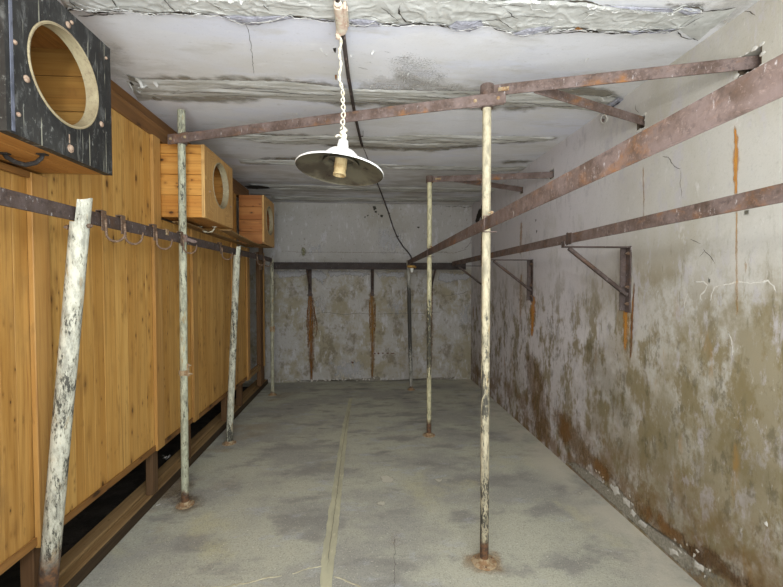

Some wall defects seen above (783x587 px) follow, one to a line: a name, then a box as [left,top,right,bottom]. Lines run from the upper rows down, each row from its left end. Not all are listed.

peeling [215,13,293,25]
peeling [442,20,490,32]
corrosion [306,296,318,380]
corrosion [520,284,535,336]
corrosion [623,288,635,358]
crack [684,280,777,309]
leakage [525,353,617,485]
crack [203,565,361,587]
spalling [567,462,722,580]
leakage [630,500,751,587]